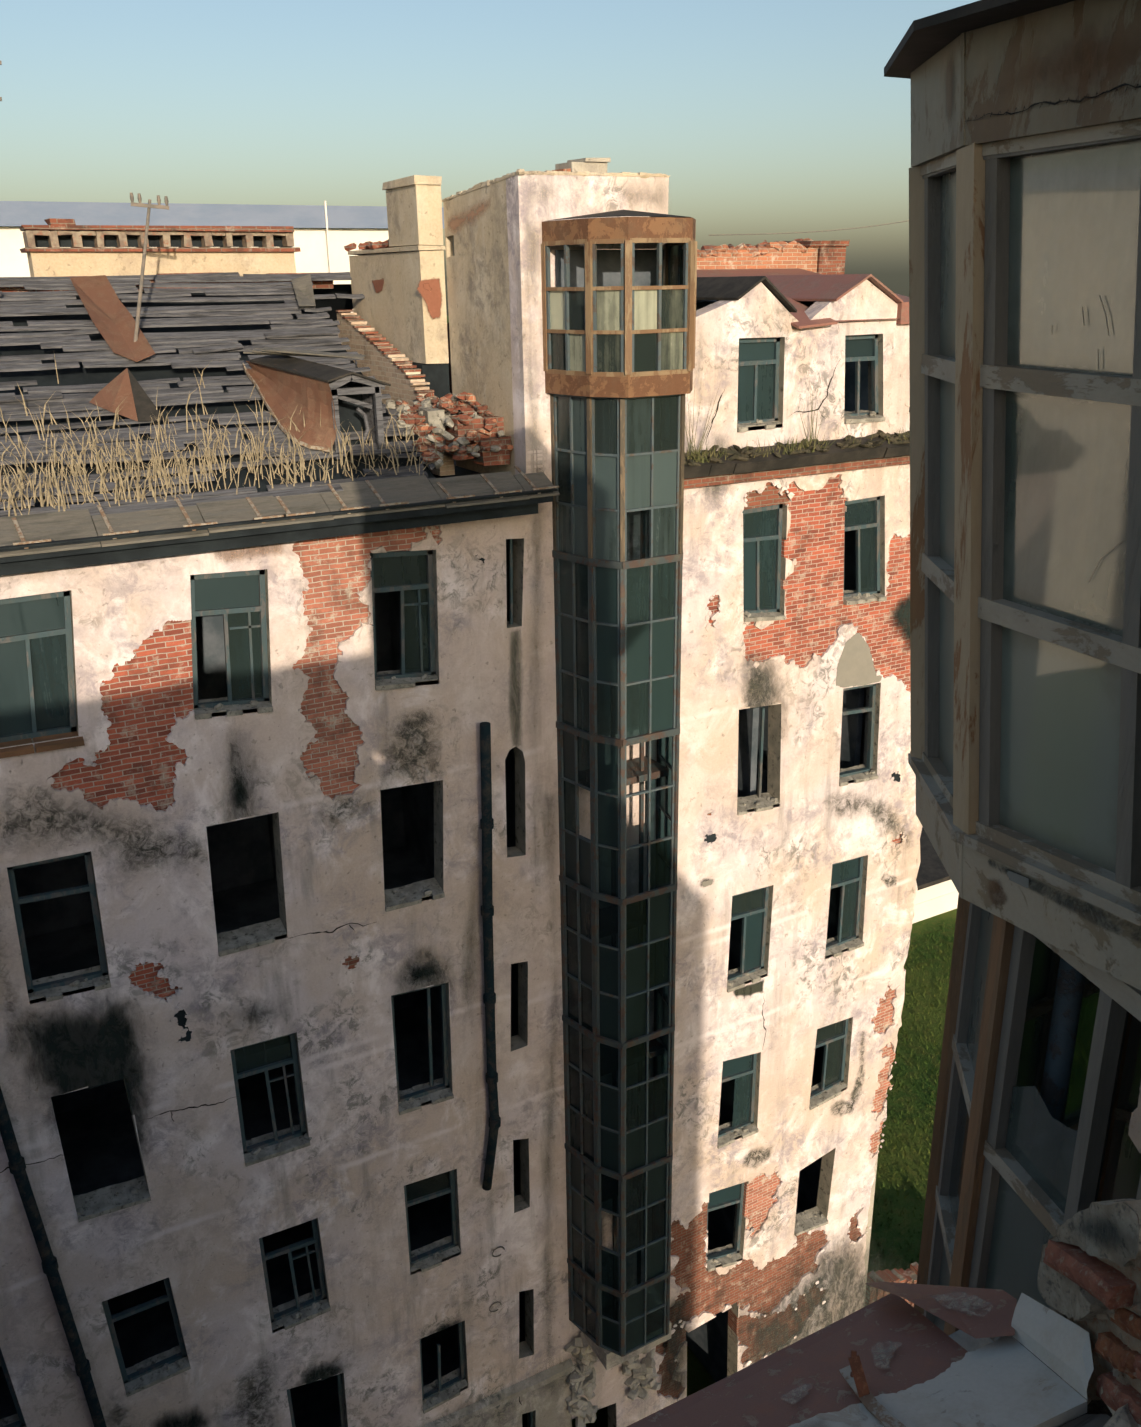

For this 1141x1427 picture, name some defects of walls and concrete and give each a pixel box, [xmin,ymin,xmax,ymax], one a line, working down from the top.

crack [967,83,1141,122]
spalling [417,278,442,319]
spalling [741,474,910,691]
spalling [292,525,441,800]
spalling [46,620,194,814]
water stain [388,713,435,774]
spalling [126,957,195,1044]
spalling [833,981,901,1160]
spalling [735,1148,784,1239]
spalling [847,1204,871,1244]
spalling [655,1202,828,1401]